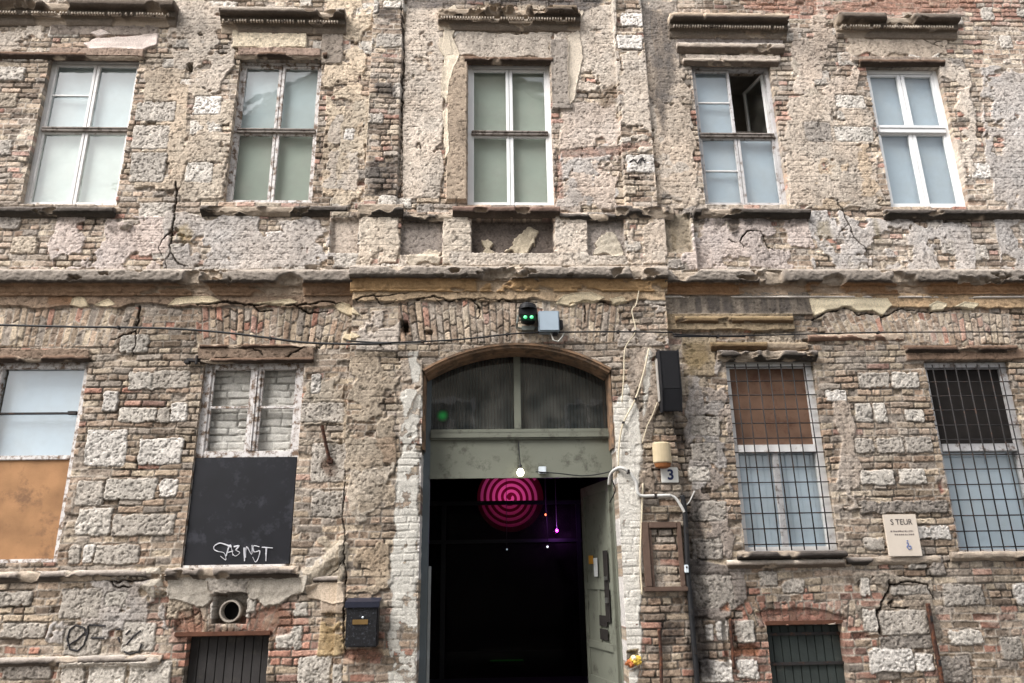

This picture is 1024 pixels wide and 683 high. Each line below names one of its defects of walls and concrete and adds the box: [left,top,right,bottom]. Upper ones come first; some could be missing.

crack [158,182,184,269]
peeling [481,227,539,253]
crack [728,230,774,251]
crack [838,205,869,255]
crack [119,306,141,354]
crack [196,292,538,317]
peeling [554,292,627,307]
peeling [809,297,892,317]
peeling [929,300,978,312]
peeling [168,577,214,632]
peeling [247,575,345,634]
crack [876,581,934,635]